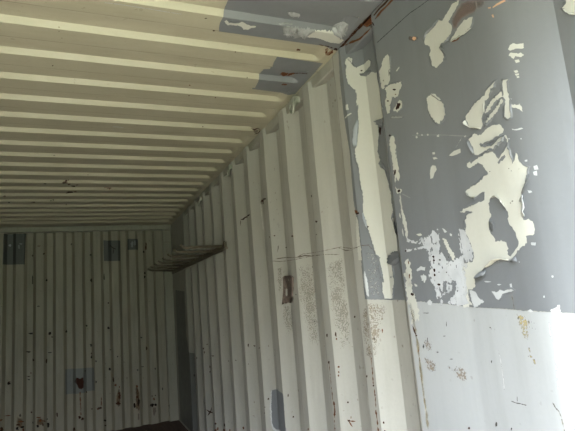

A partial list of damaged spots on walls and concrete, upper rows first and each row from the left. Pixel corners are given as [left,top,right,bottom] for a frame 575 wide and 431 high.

peeling [223,20,257,30]
peeling [279,12,348,44]
corrosion [319,0,393,55]
peeling [423,0,474,68]
peeling [508,43,524,63]
peeling [425,94,446,125]
peeling [344,53,403,300]
peeling [460,70,538,308]